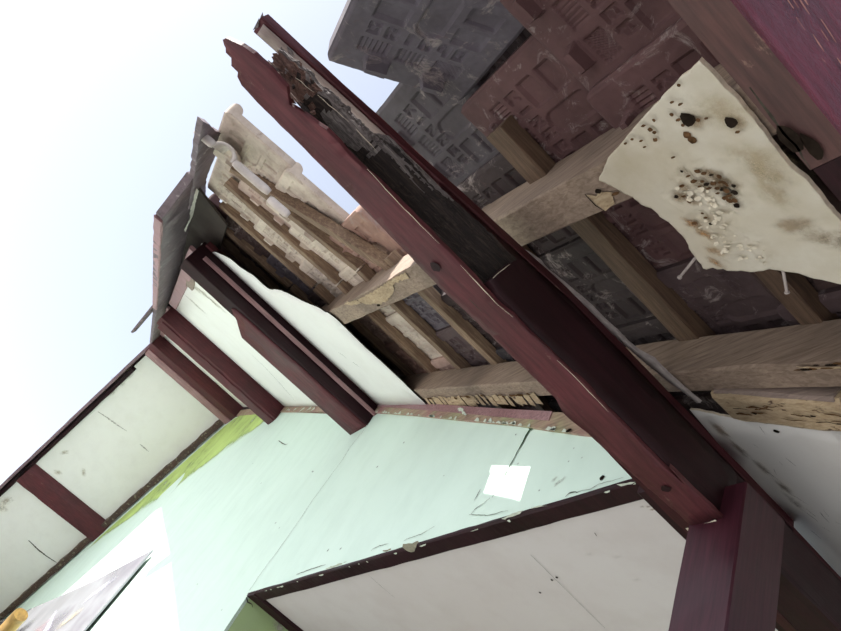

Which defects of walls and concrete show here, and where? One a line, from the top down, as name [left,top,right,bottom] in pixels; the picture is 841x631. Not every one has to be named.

spalling [669,101,697,144]
peeling [674,169,766,263]
crack [469,428,532,516]